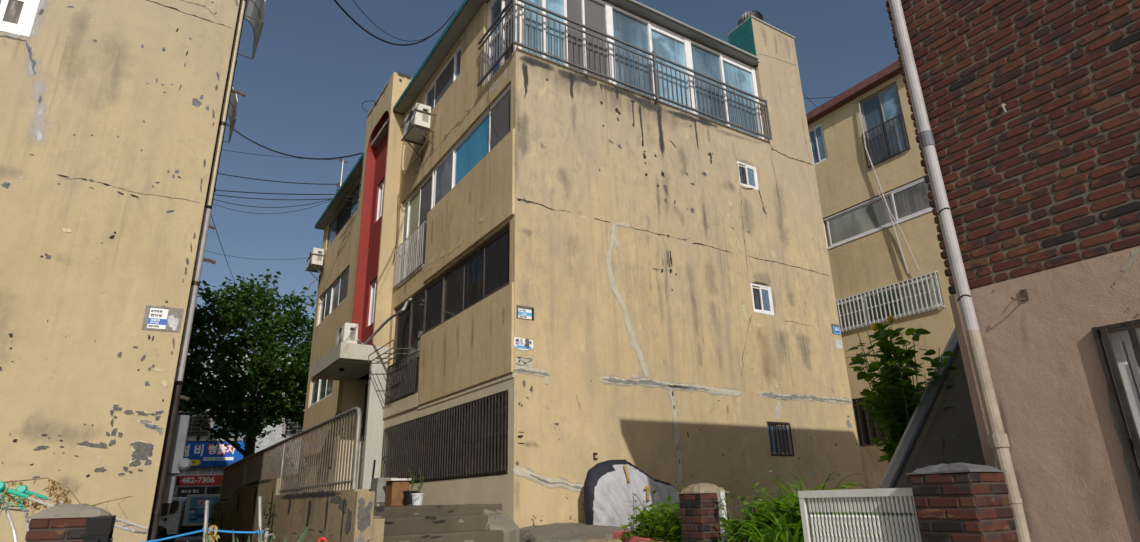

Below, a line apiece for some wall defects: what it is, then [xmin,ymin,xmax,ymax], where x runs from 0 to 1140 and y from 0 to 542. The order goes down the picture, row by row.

crack [147,0,231,28]
peeling [192,72,219,125]
leakage [521,56,728,155]
crack [57,174,199,203]
crack [514,106,853,486]
peeling [30,335,167,479]
crack [513,466,584,493]
flaking render [330,495,395,542]